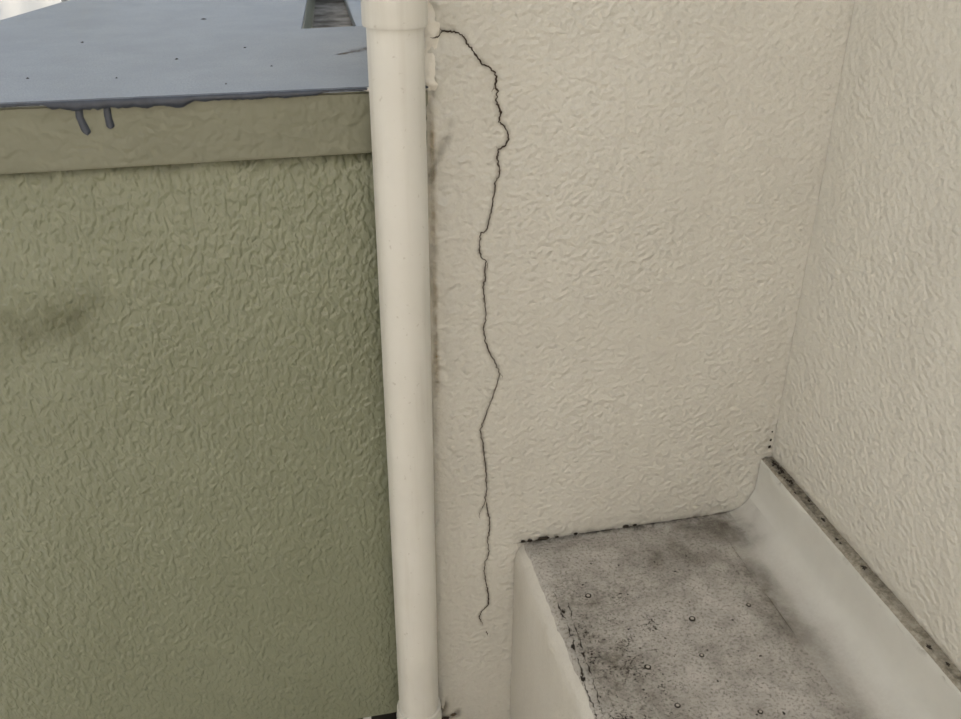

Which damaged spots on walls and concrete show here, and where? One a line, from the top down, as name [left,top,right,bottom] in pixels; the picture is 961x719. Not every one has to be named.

crack [430,29,509,635]
mould [768,431,825,522]